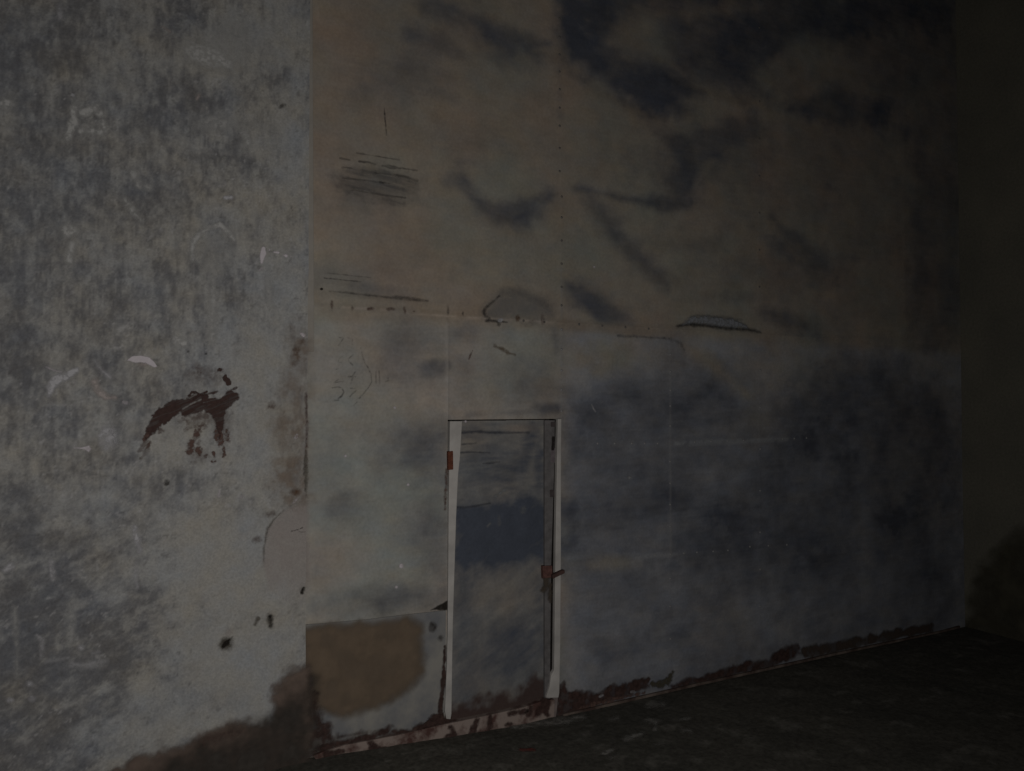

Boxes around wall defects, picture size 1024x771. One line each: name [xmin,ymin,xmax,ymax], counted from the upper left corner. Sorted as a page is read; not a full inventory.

rust [143,368,239,463]
water stain [112,666,314,771]
rust [306,617,492,757]